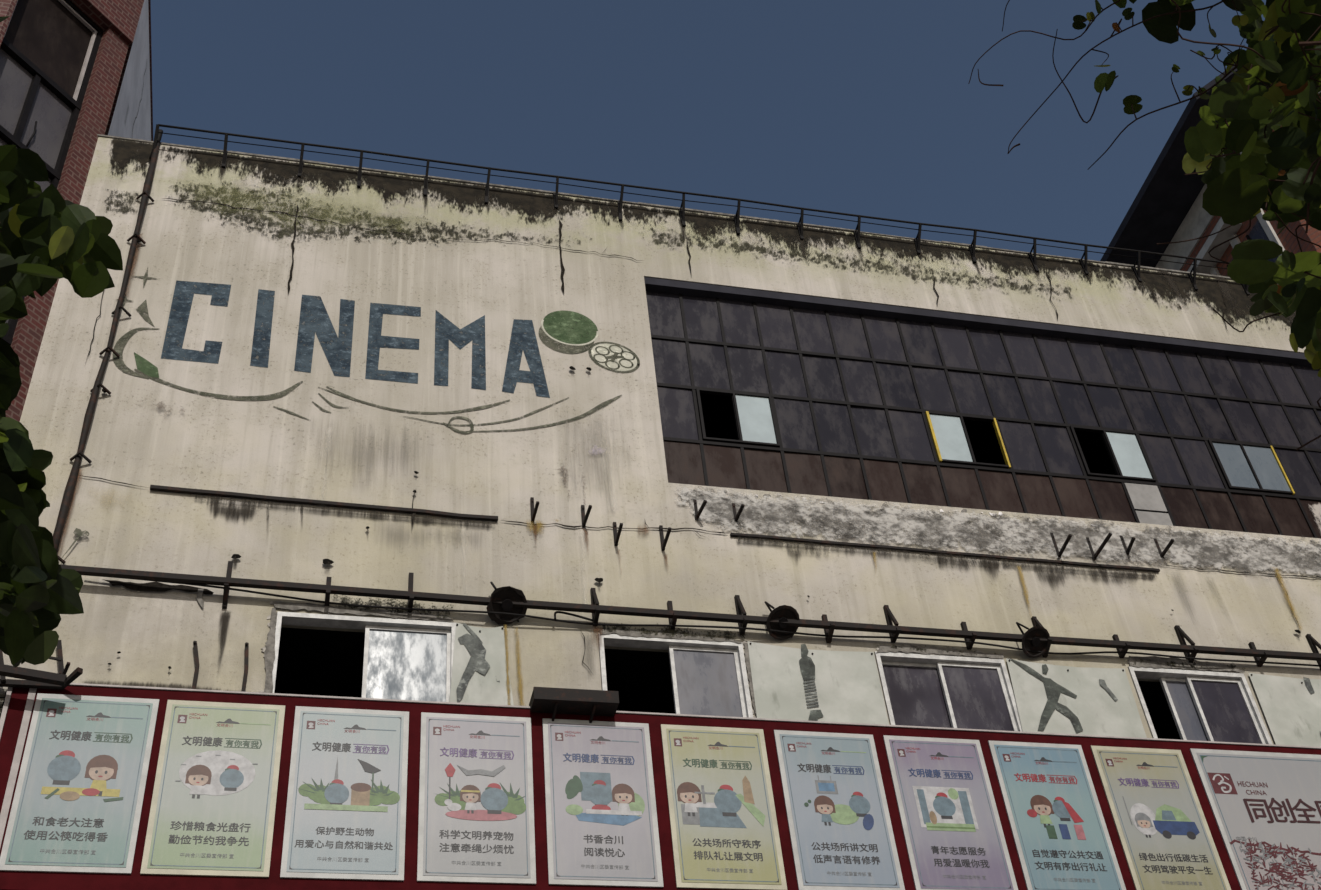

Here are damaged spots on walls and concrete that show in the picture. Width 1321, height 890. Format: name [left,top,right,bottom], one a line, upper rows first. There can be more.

crack [162,198,405,294]
crack [443,220,645,293]
damp [104,139,1296,330]
damp [693,494,1321,585]